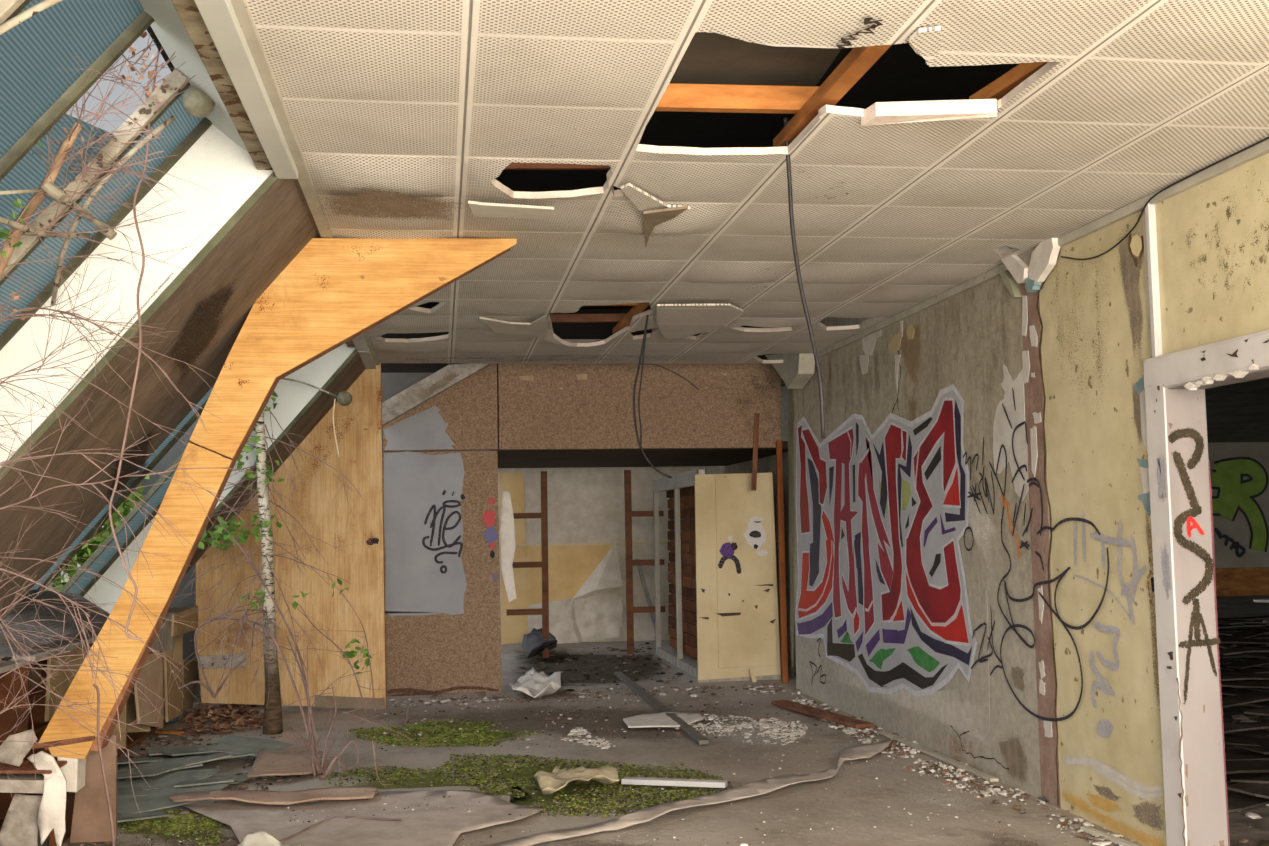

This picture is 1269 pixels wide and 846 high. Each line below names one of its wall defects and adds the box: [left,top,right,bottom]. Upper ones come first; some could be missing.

damp [312,184,463,221]
damp [1049,219,1146,407]
peeling [993,238,1061,501]
damp [1130,378,1143,444]
peeling [1044,721,1053,738]